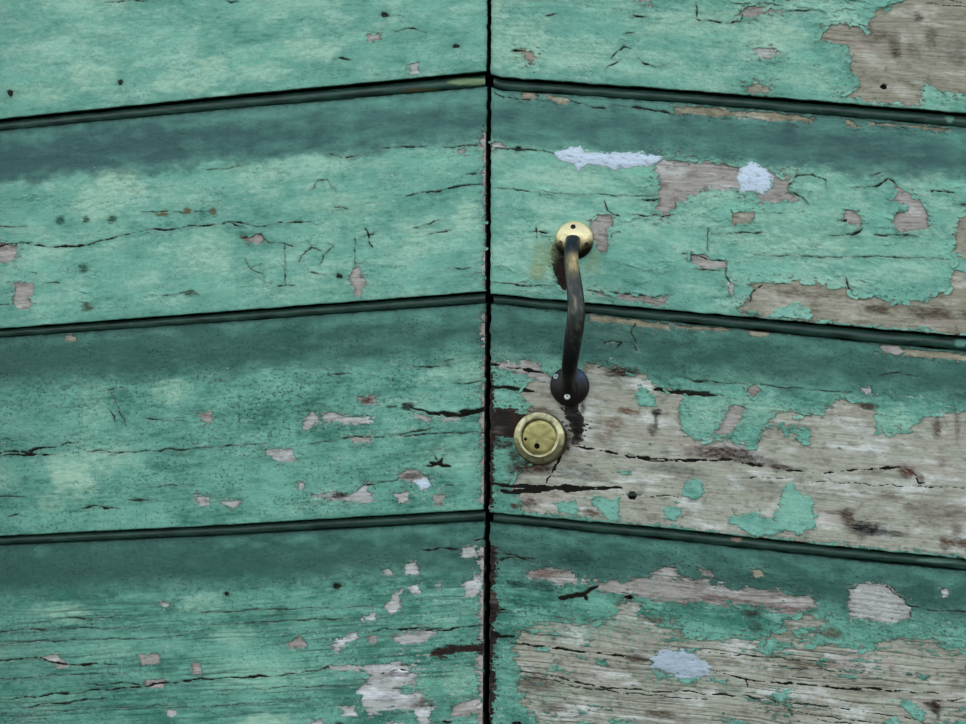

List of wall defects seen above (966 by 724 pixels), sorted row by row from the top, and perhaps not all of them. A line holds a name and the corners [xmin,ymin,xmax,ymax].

peeling [815,0,966,107]
peeling [649,148,805,227]
crack [0,226,130,248]
crack [151,211,331,287]
peeling [686,205,966,334]
crack [0,442,255,457]
peeling [299,393,380,448]
crack [317,363,544,443]
crack [427,458,451,486]
peeling [474,307,966,558]
crack [0,616,329,712]
peeling [322,544,966,724]